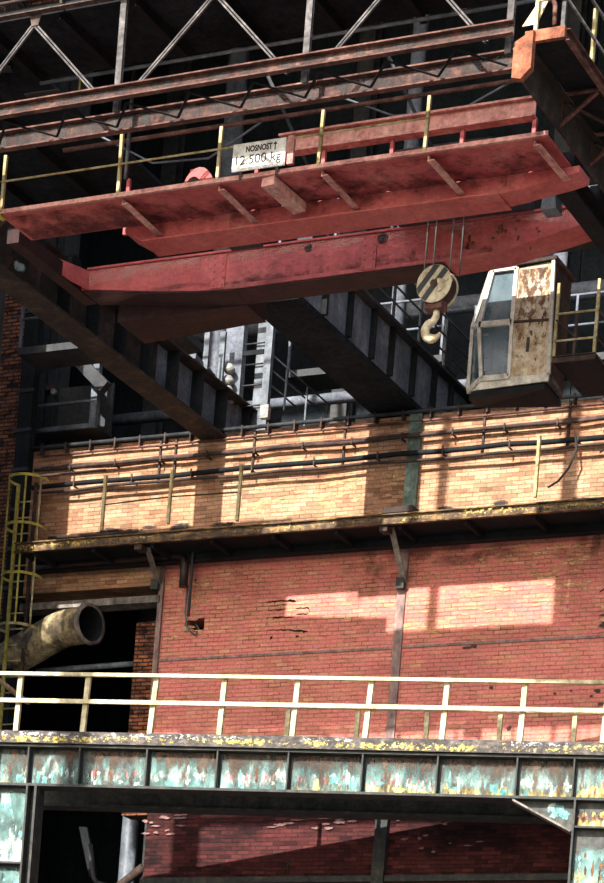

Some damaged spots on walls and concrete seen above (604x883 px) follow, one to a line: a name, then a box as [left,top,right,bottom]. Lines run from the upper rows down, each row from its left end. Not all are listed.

corrosion [516,267,551,346]
crack [265,599,310,639]
peeling [0,726,604,883]